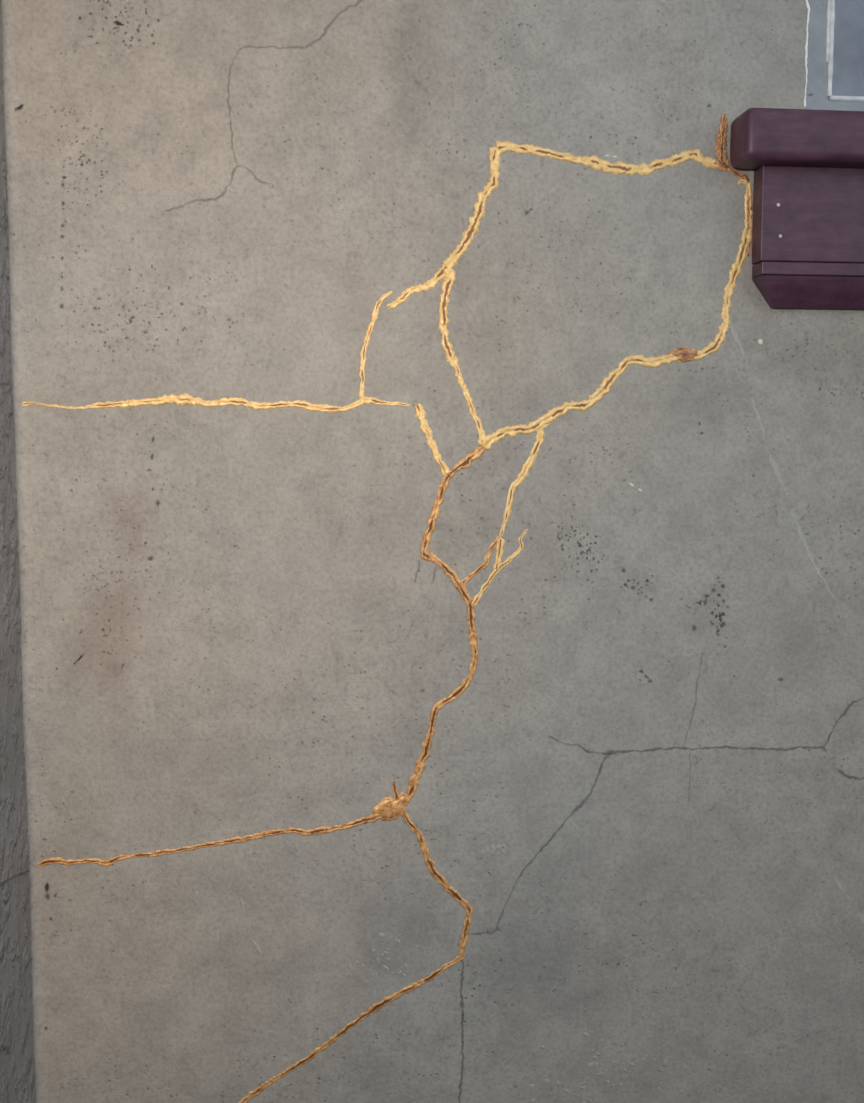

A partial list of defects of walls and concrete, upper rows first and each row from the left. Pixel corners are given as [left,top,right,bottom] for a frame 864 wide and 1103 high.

crack [22,113,753,1103]